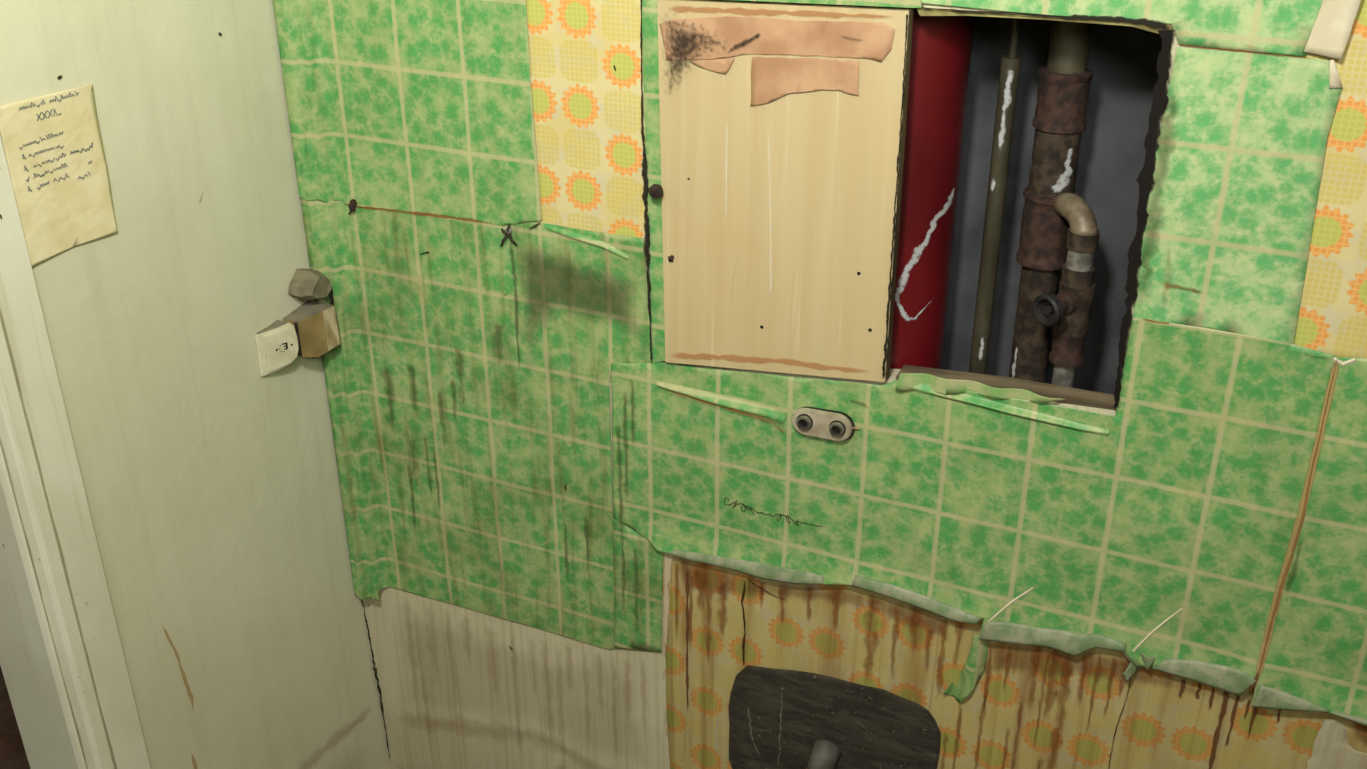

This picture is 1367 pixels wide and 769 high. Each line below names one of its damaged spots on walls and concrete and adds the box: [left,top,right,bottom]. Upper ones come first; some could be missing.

peeling [1304,0,1361,88]
peeling [998,70,1013,147]
leakage [640,0,652,363]
peeling [1052,149,1072,192]
leakage [511,249,623,357]
leakage [361,600,391,763]
peeling [663,553,673,676]
corrosion [892,609,961,682]
corrosion [1018,649,1123,769]
corrosion [1179,363,1338,769]